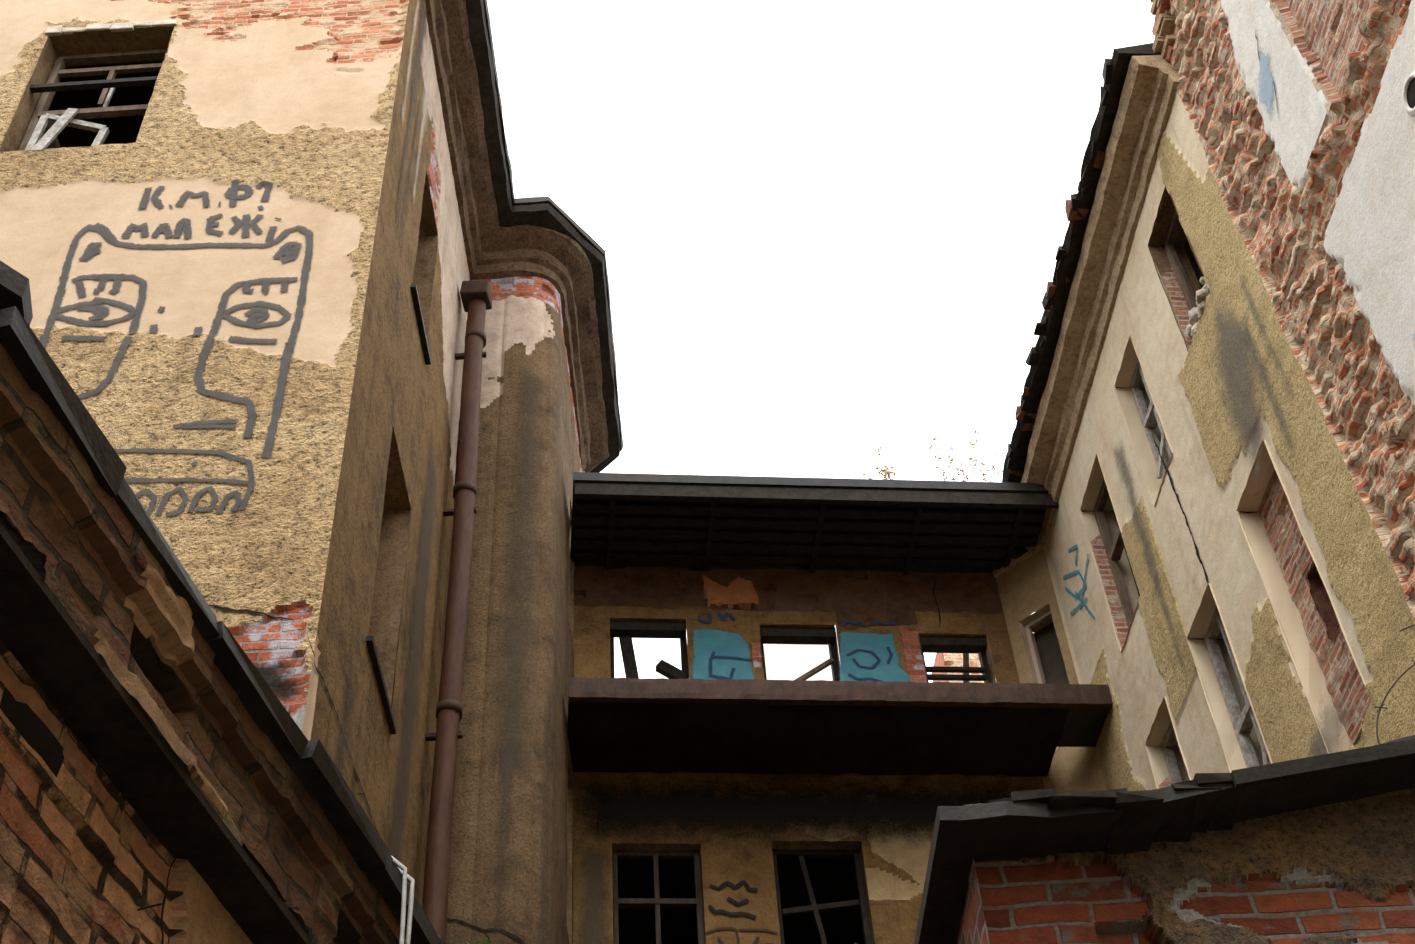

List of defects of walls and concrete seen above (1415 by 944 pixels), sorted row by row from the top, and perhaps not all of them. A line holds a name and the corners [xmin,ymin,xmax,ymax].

flaking render [0,0,409,134]
flaking render [0,177,364,367]
flaking render [421,17,585,485]
spalling [1150,0,1415,619]
flaking render [1043,156,1373,790]
spalling [227,601,321,741]
crack [204,592,378,832]
crack [447,918,526,944]